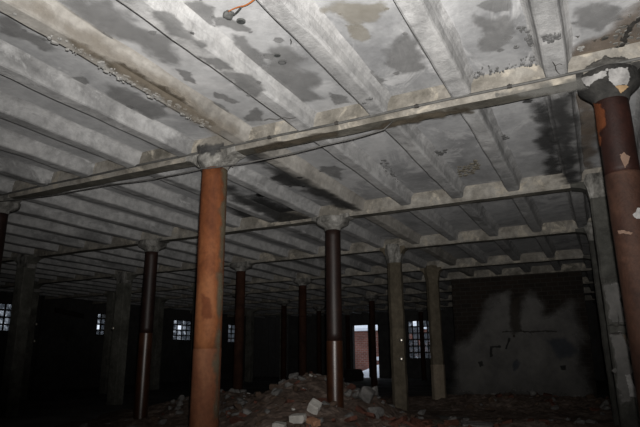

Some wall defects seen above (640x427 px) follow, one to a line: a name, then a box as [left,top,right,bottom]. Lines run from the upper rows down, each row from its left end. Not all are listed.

leakage [65,0,206,83]
leakage [186,0,320,101]
leakage [323,3,389,41]
leakage [387,32,425,75]
leakage [475,0,534,52]
peeling [581,9,640,93]
leakage [109,87,167,119]
leakage [331,94,348,104]